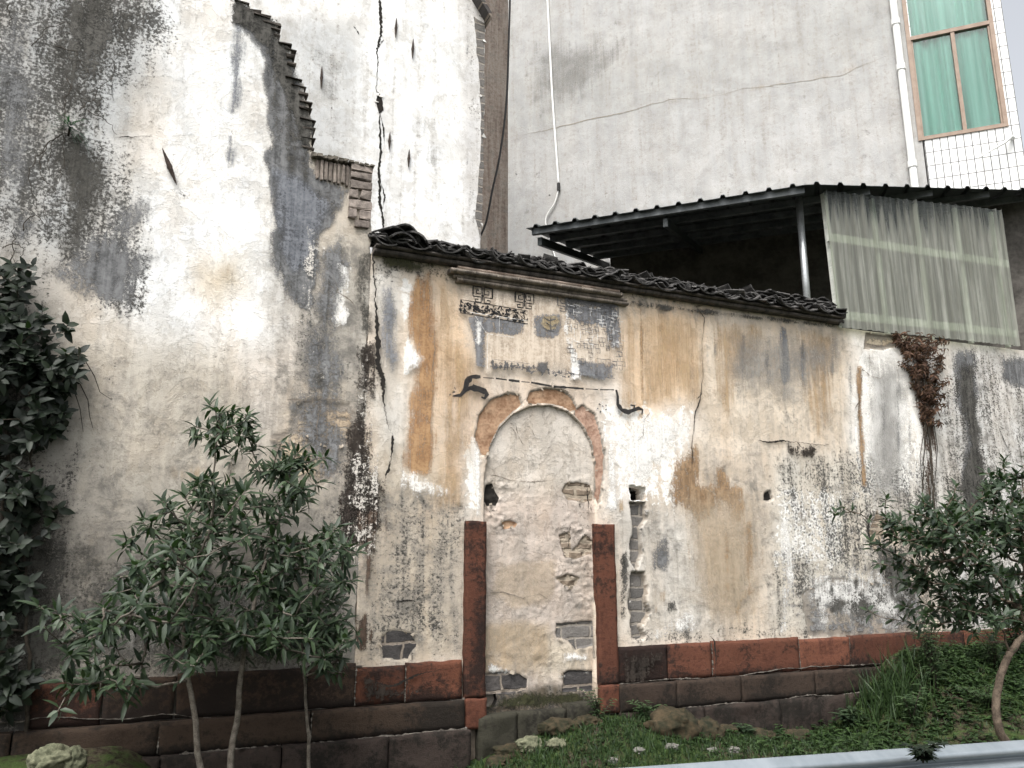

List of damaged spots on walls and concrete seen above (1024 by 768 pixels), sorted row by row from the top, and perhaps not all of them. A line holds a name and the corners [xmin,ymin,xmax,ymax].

crack [354,0,386,228]
leakage [55,125,152,314]
leakage [231,0,421,591]
crack [333,254,394,476]
crack [689,304,705,490]
leakage [953,350,985,514]
leakage [1002,357,1024,388]
spalling [379,631,416,660]
spalling [556,621,593,650]
spalling [562,670,592,692]
spalling [628,488,651,642]
leakage [806,512,919,631]